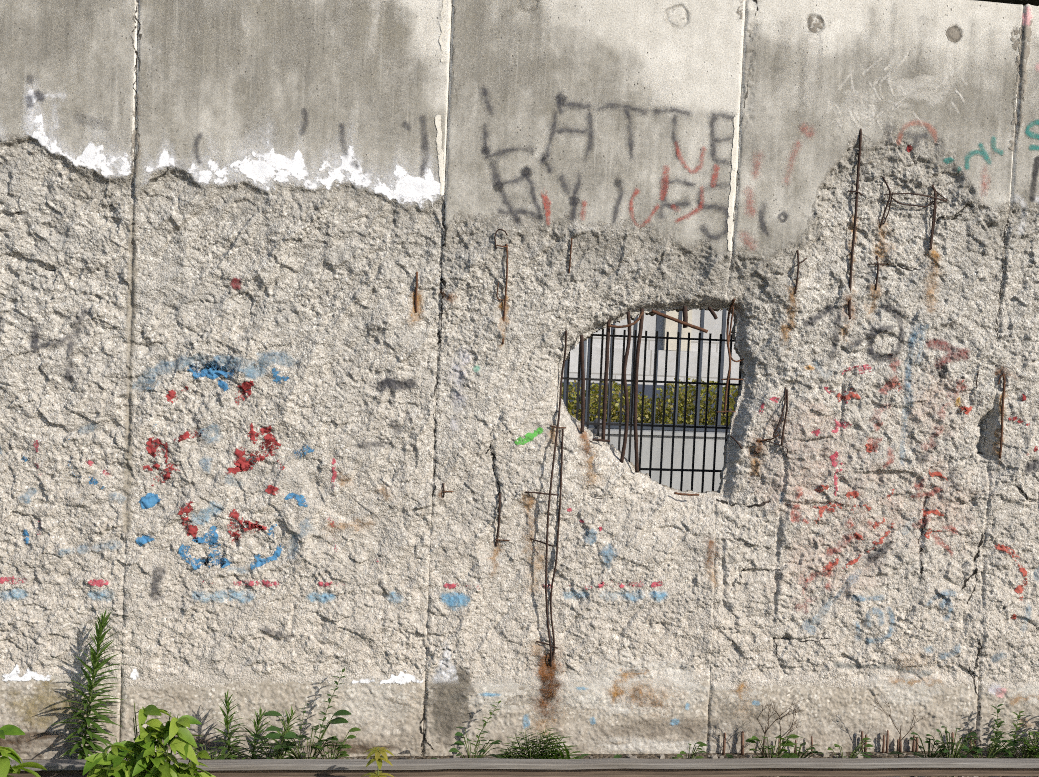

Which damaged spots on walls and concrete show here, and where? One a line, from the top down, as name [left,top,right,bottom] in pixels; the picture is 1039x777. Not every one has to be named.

water stain [0,0,684,234]
water stain [700,159,729,232]
corrosion [847,128,863,319]
corrosion [879,176,948,263]
corrosion [494,229,508,344]
spalling [0,89,1039,693]
corrosion [580,306,708,473]
corrosion [730,387,788,457]
corrosion [495,493,510,547]
corrosion [525,330,567,704]
crack [961,533,984,604]
crack [968,638,982,745]